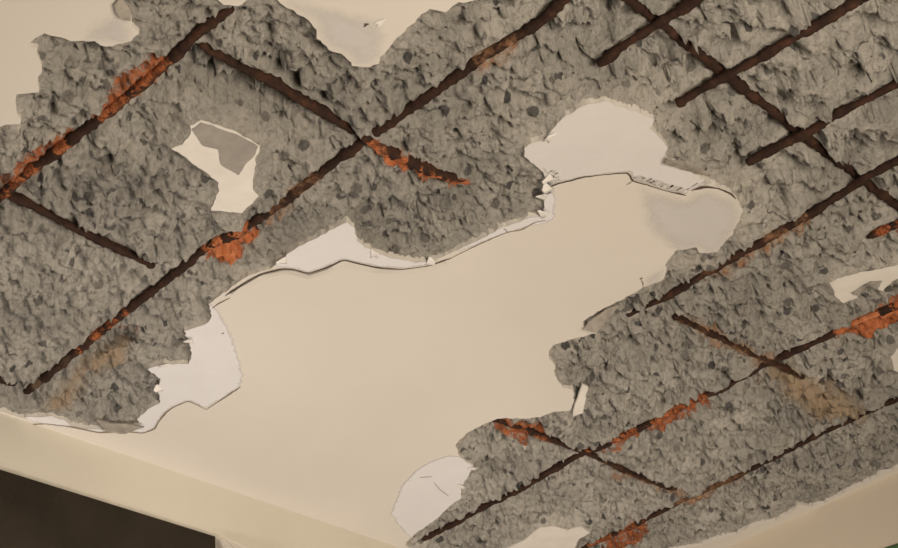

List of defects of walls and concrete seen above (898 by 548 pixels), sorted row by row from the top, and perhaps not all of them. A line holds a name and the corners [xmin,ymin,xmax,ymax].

spalling [596,0,845,75]
spalling [0,0,235,203]
rust [92,53,172,121]
spalling [197,42,355,134]
spalling [675,0,898,179]
rust [0,129,74,198]
rust [366,141,471,187]
rust [202,212,285,265]
spalling [645,155,898,309]
rust [833,295,898,339]
rust [586,392,709,463]
spalling [421,440,616,541]